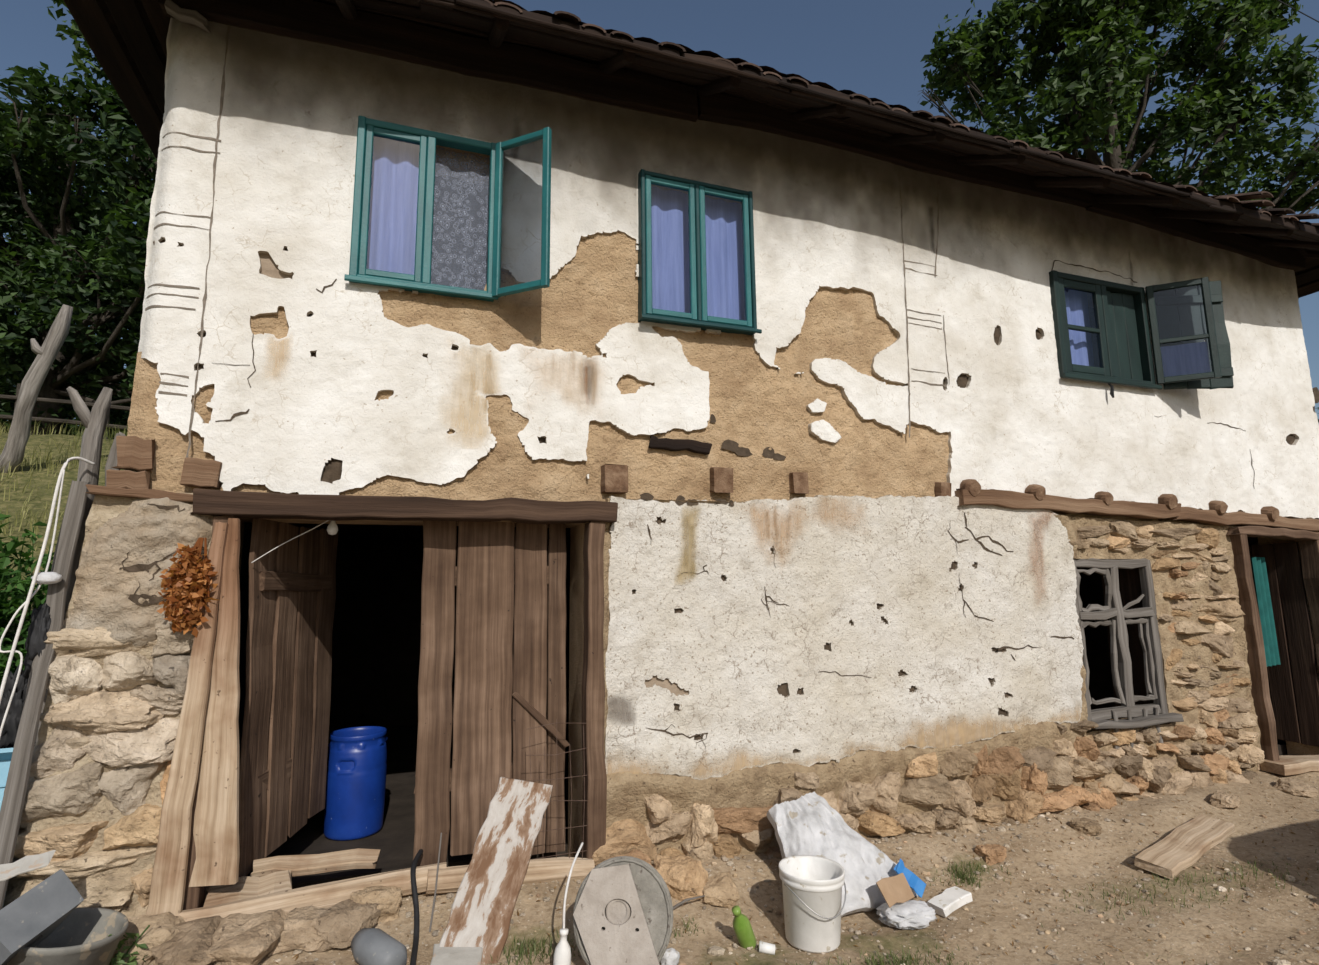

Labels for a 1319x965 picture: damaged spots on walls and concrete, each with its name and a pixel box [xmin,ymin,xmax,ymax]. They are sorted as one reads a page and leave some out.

flaking render [259,248,293,279]
flaking render [251,308,289,339]
crack [215,333,256,422]
flaking render [321,231,950,507]
flaking render [124,352,299,494]
water stain [678,511,696,580]
crack [948,512,1074,661]